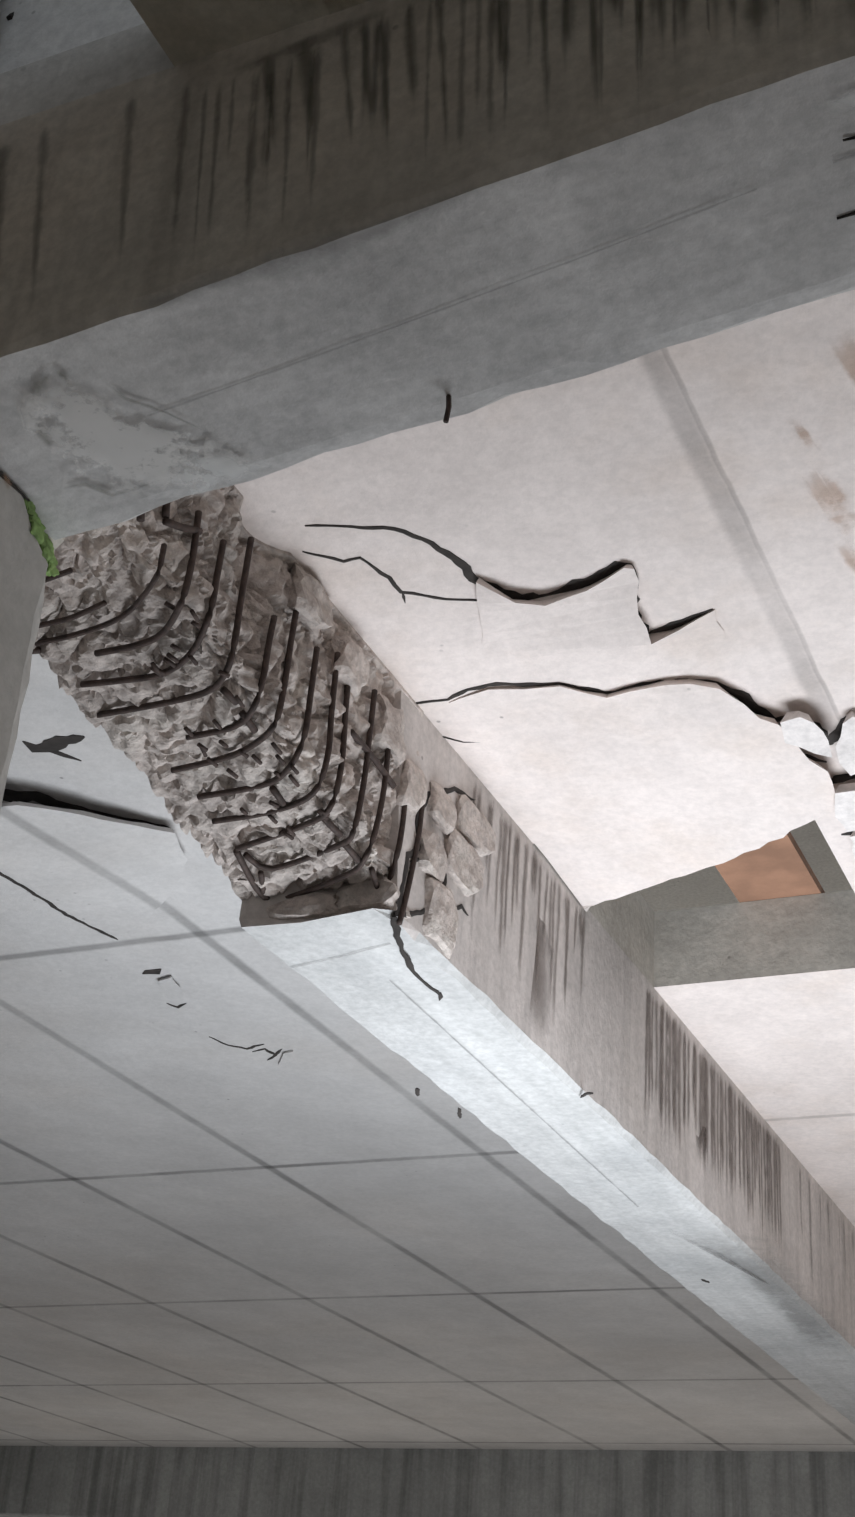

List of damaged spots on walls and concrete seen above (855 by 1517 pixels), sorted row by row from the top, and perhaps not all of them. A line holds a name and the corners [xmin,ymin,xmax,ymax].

crack [22,734,85,761]
crack [0,789,187,940]
spalling [23,372,496,959]
damp [474,791,585,994]
crack [302,524,855,1001]
damp [645,993,781,1224]